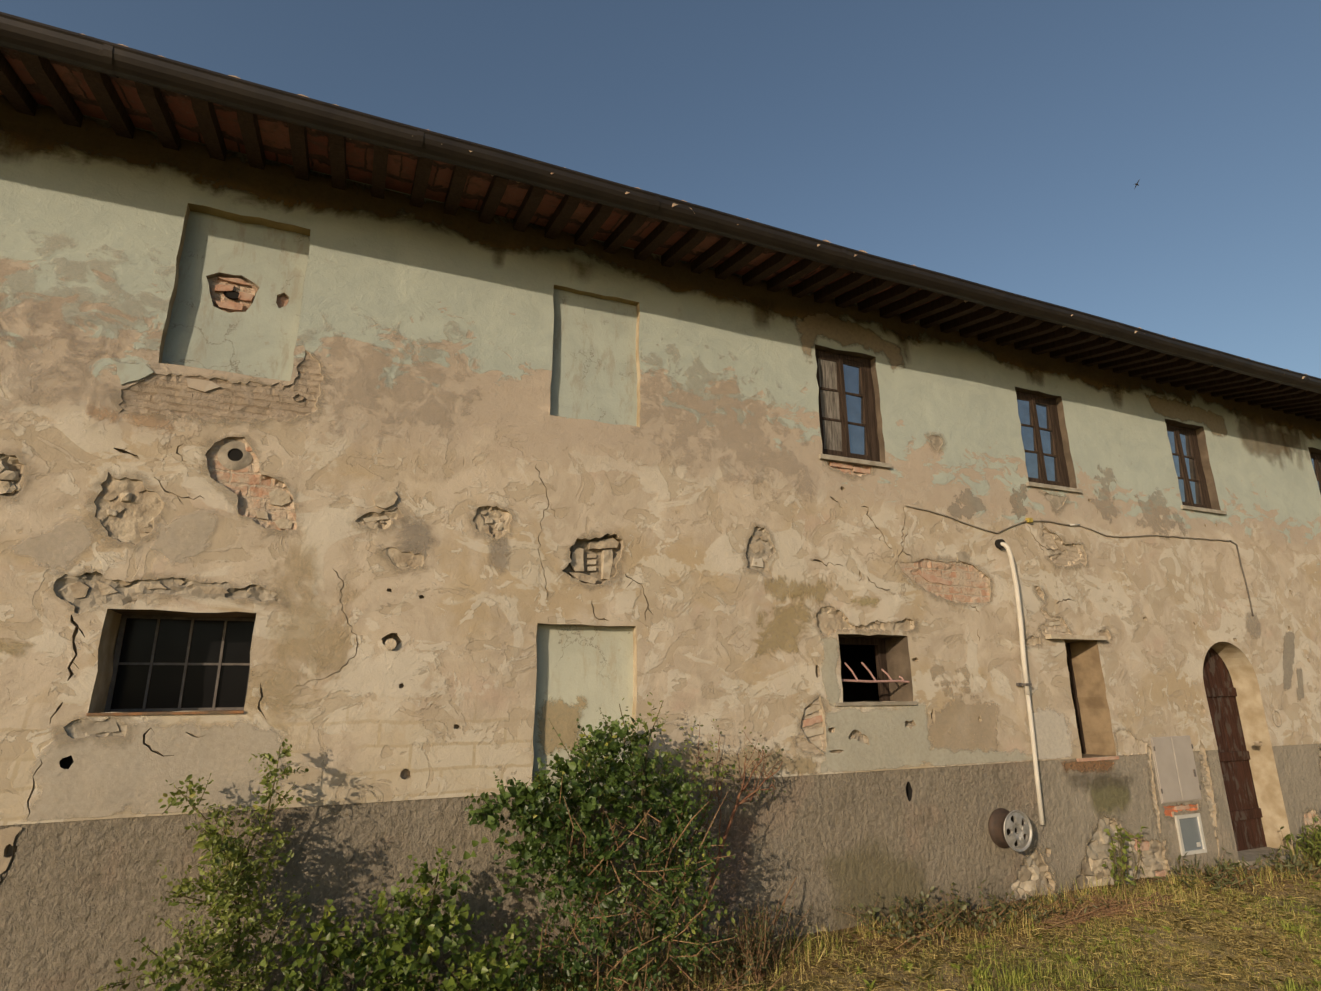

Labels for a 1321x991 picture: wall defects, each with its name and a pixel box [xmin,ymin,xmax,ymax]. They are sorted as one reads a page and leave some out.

spalling [206,272,259,313]
spalling [0,453,24,497]
spalling [94,472,164,545]
spalling [53,571,281,614]
spalling [115,350,323,530]
crack [535,467,557,600]
spalling [562,534,623,586]
crack [812,496,912,591]
crack [50,614,85,723]
crack [0,758,43,884]
spalling [1071,729,1217,890]
spalling [1005,848,1055,903]